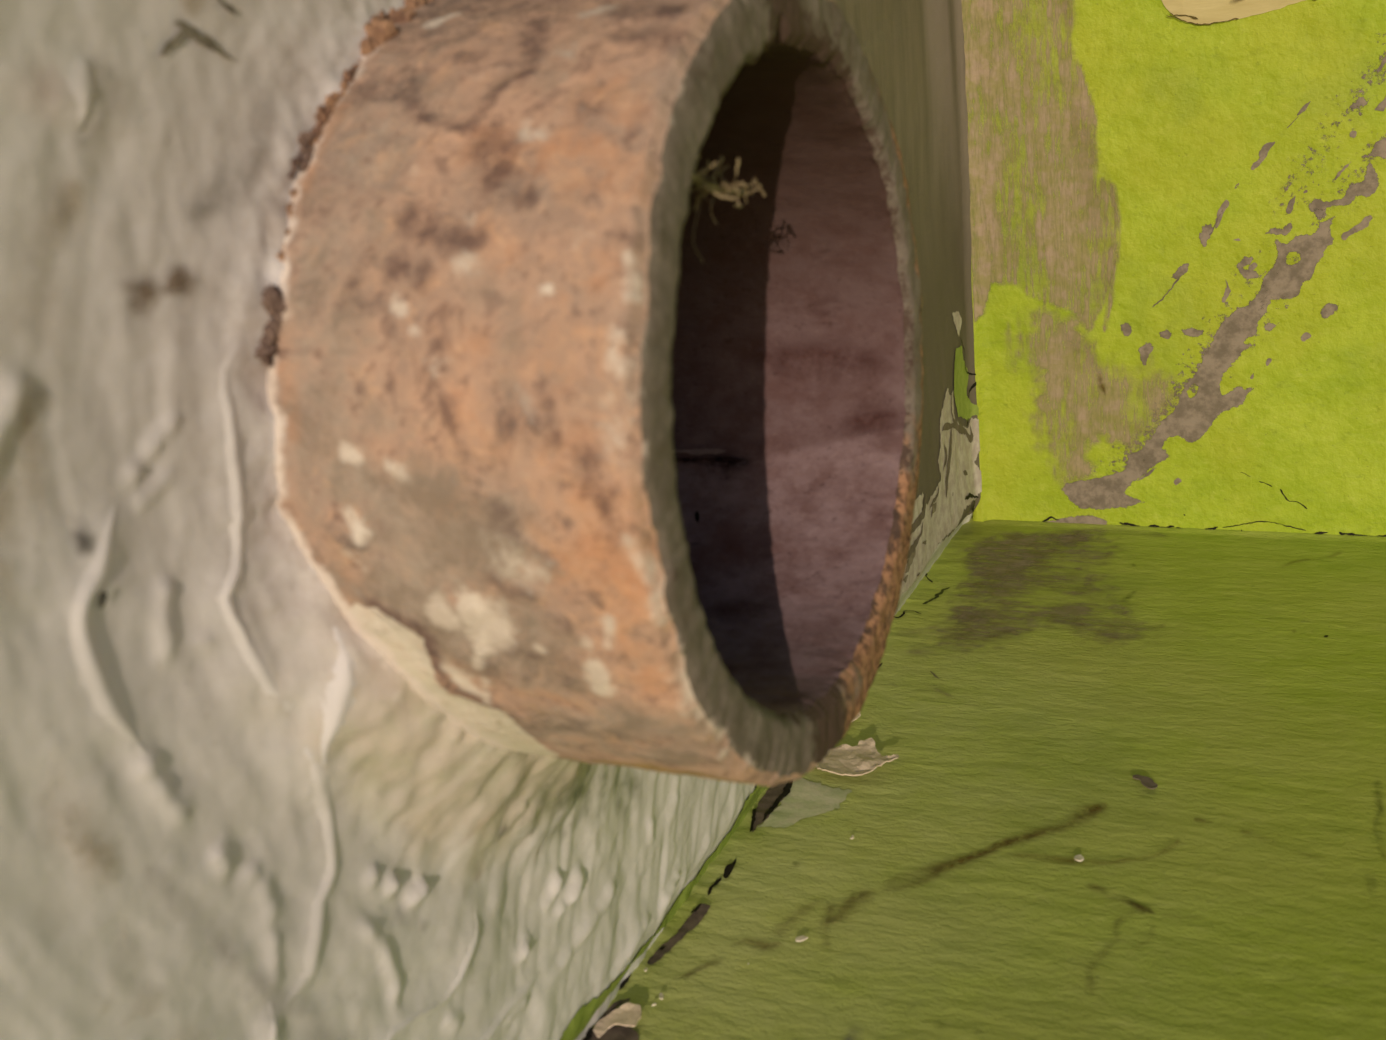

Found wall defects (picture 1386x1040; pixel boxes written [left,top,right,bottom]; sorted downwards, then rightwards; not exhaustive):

peeling [1047,34,1386,525]
peeling [899,311,982,599]
peeling [758,778,852,828]
peeling [582,1002,642,1040]